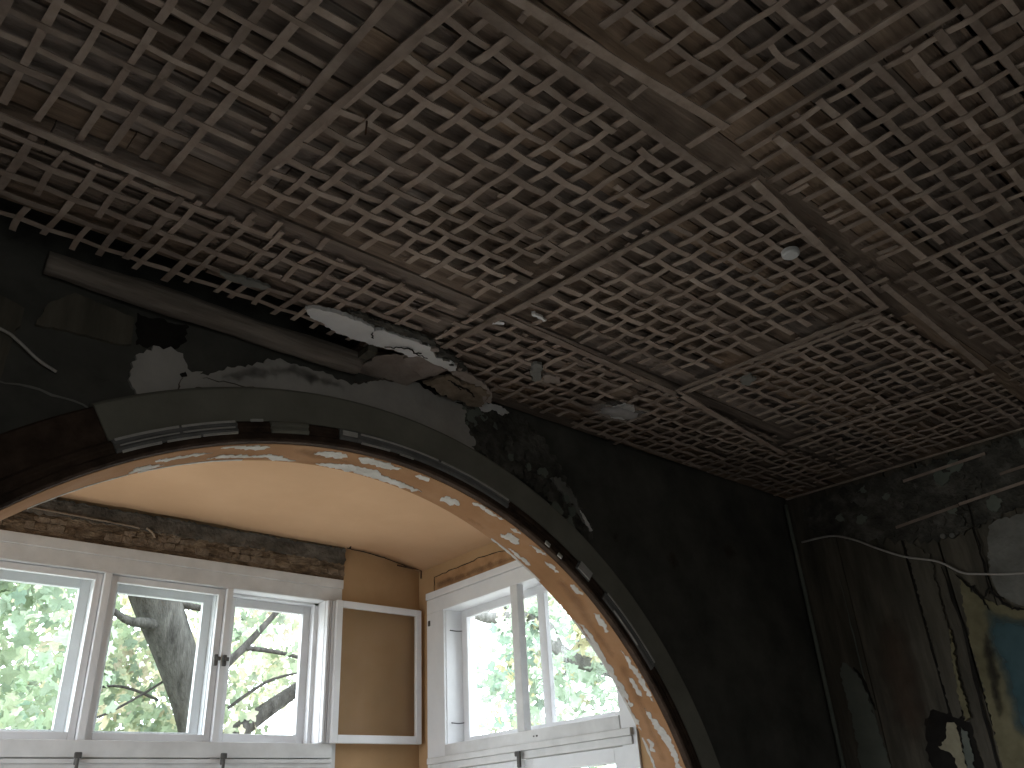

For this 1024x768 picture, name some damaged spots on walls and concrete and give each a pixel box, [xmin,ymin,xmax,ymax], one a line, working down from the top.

crack [371,332,428,359]
spalling [347,309,468,373]
spalling [0,420,346,580]
peeling [314,430,509,501]
peeling [440,496,563,581]
spalling [417,381,594,541]
spalling [578,561,593,580]
spalling [607,593,655,663]
peeling [573,613,682,768]
peeling [840,663,892,768]
spalling [939,722,975,768]
peeling [990,615,1024,731]